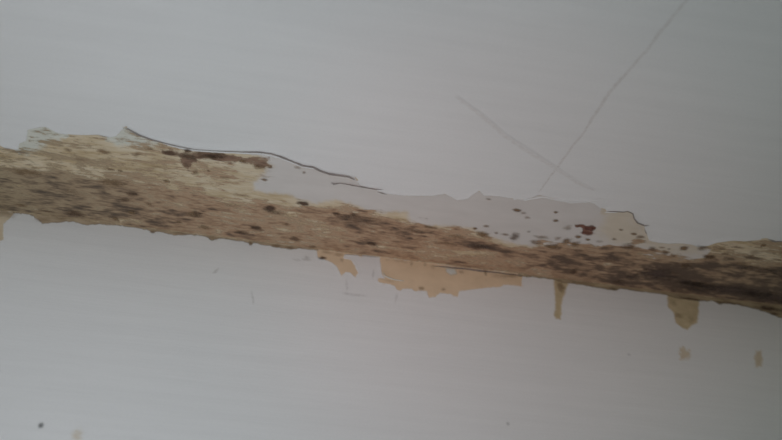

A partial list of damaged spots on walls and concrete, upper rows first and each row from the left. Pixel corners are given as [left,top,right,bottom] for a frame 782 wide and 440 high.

leakage [0,129,782,306]
peeling [0,121,782,333]